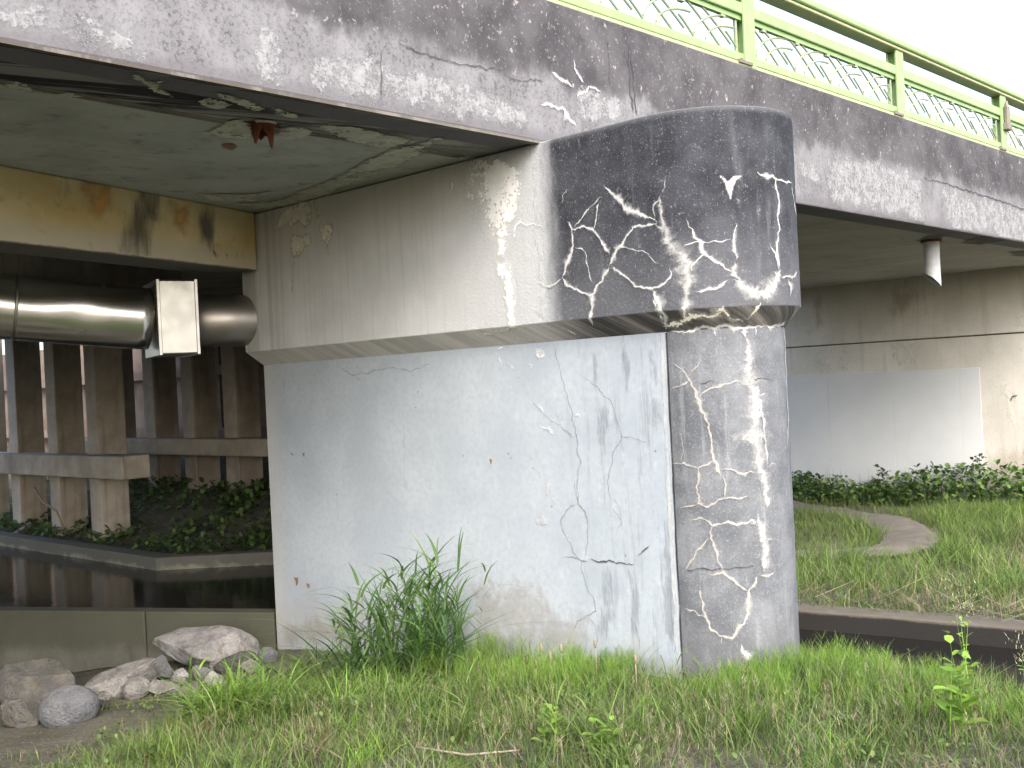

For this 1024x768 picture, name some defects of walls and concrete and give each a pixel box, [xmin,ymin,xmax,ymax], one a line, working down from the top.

spalling [133,75,170,95]
spalling [198,93,311,139]
crack [380,43,543,94]
peeling [466,158,543,340]
crack [537,187,732,327]
crack [760,174,796,269]
crack [674,334,789,639]
crack [563,546,649,565]